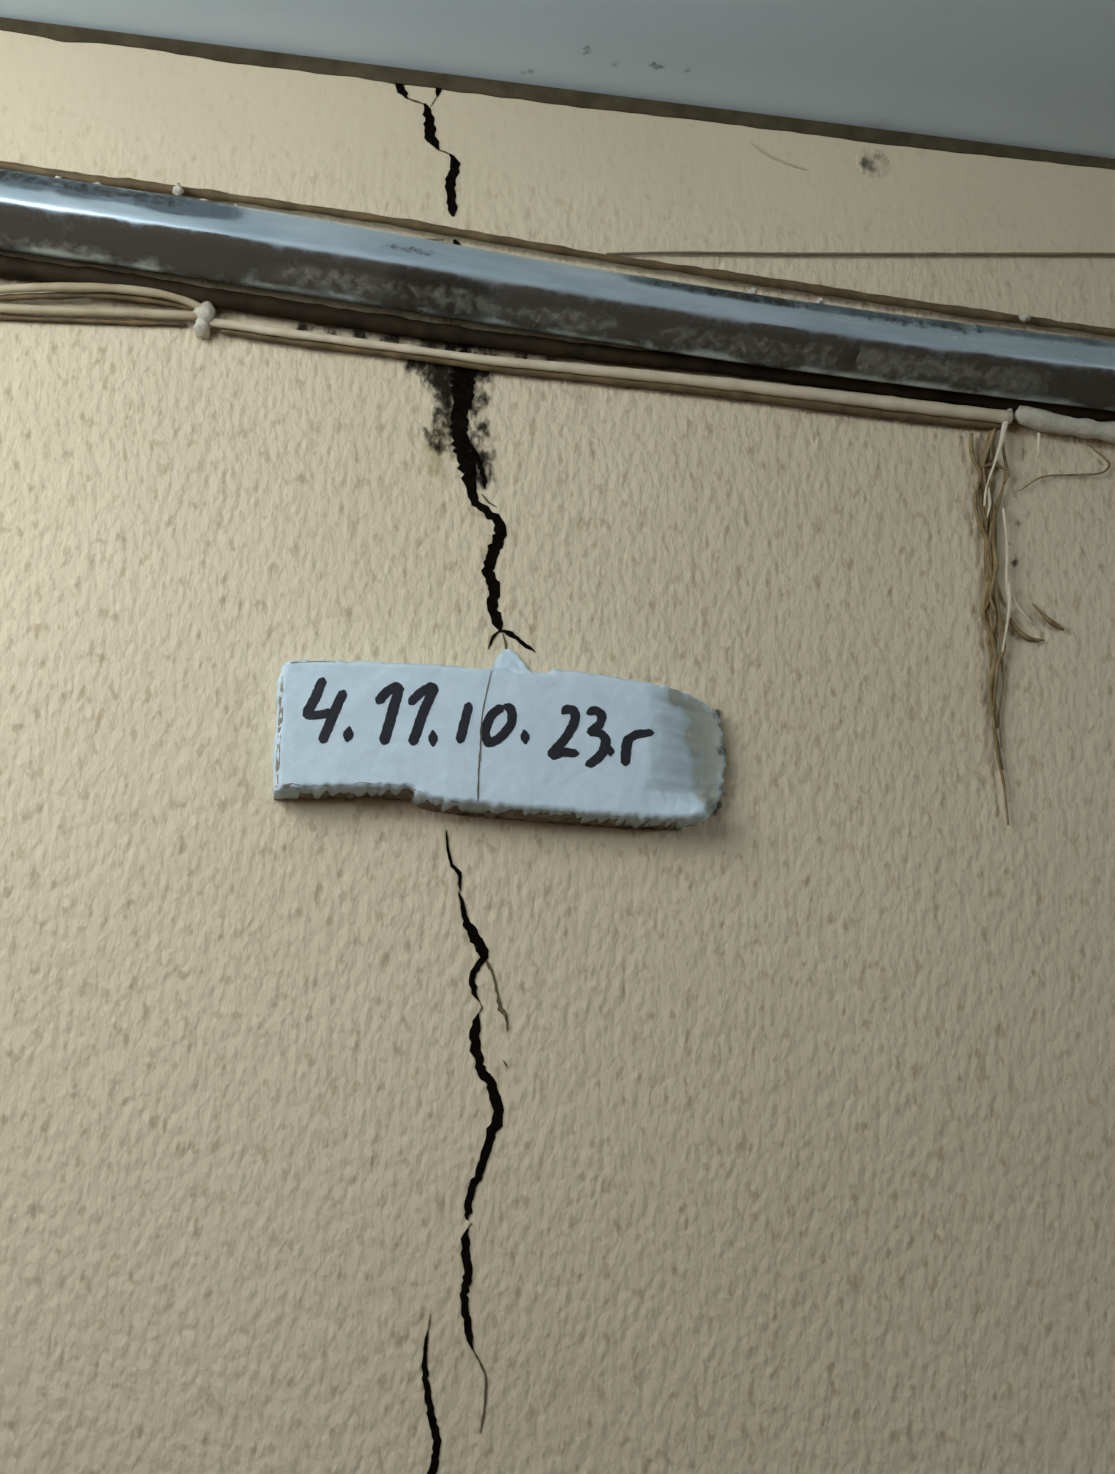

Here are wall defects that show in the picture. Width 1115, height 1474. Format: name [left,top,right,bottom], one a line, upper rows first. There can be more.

crack [449,350,535,801]
crack [421,831,508,1474]